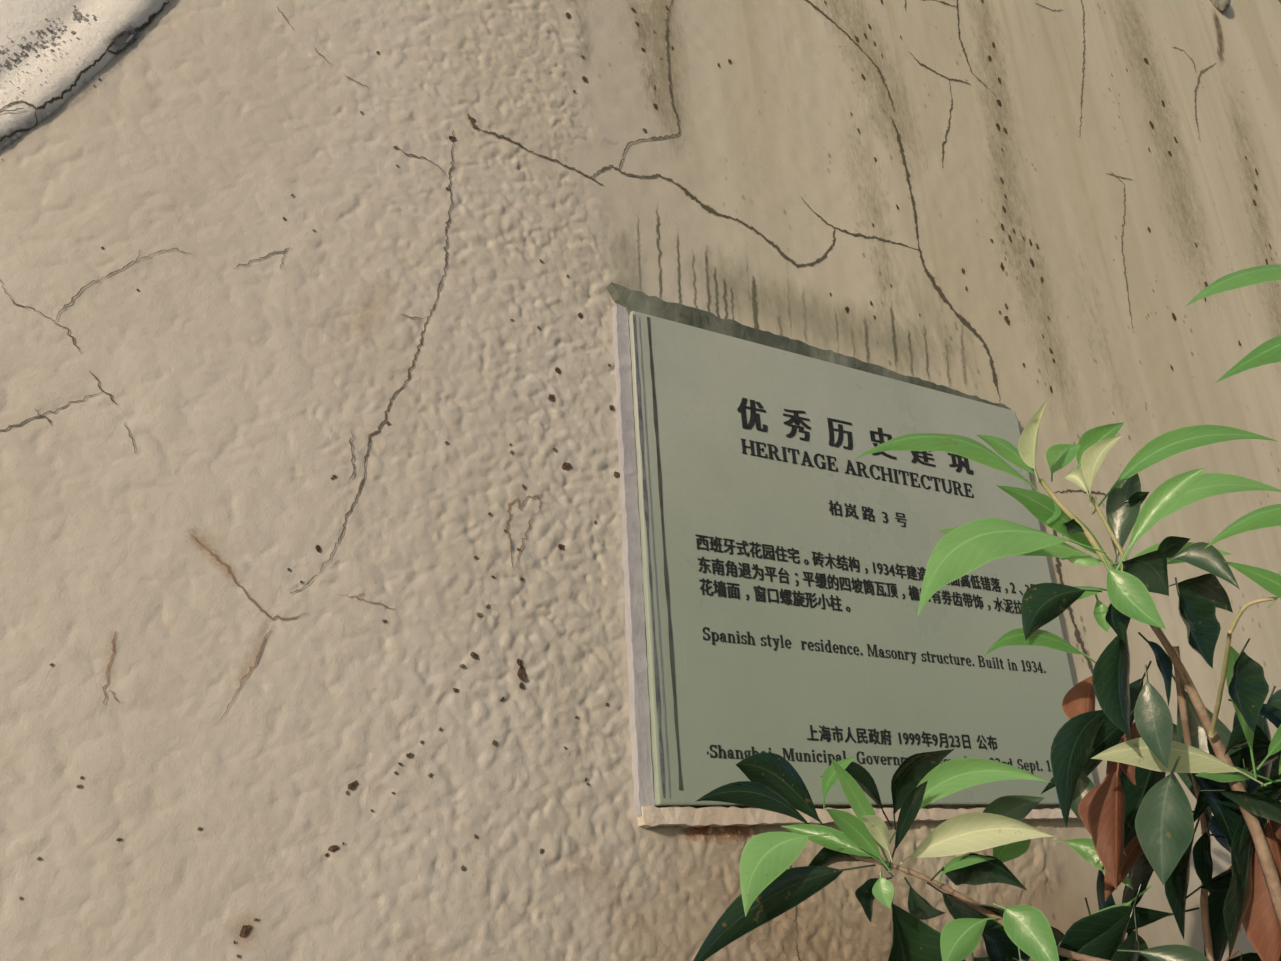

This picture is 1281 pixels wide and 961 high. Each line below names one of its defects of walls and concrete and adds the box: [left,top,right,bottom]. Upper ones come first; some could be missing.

damp [0,5,96,121]
crack [0,2,169,142]
crack [1035,0,1086,137]
crack [1173,47,1217,141]
damp [1215,15,1223,59]
crack [1106,171,1134,334]
crack [0,248,187,454]
crack [190,0,1000,720]